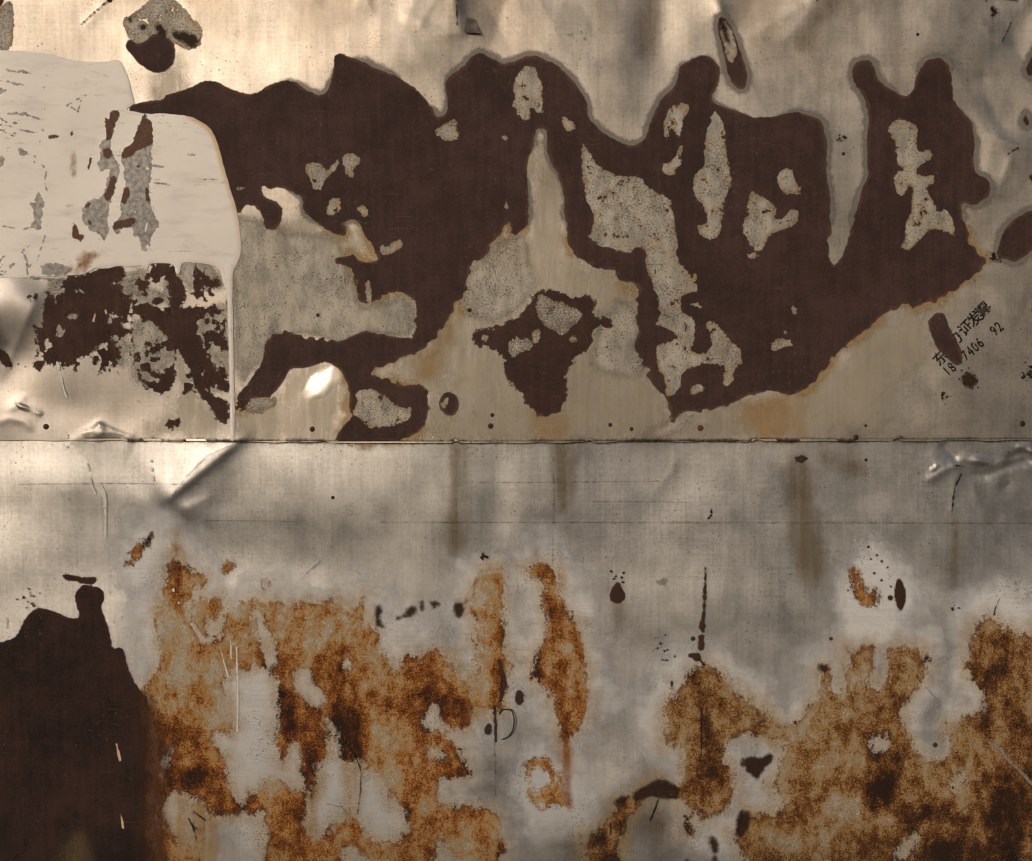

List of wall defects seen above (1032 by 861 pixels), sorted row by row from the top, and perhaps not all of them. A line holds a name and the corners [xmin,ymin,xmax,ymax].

peeling [72,110,166,251]
corrosion [123,531,154,567]
corrosion [0,544,524,861]
corrosion [521,562,590,811]
corrosion [581,567,1032,861]
corrosion [848,554,906,610]